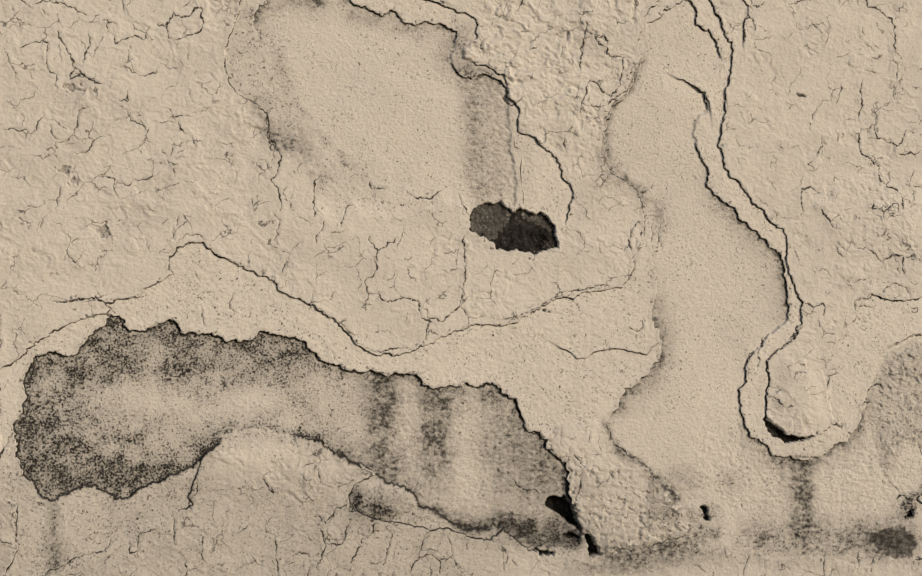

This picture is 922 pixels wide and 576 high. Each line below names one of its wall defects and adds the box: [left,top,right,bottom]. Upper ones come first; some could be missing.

crack [8,0,204,127]
peeling [221,0,578,255]
crack [560,22,624,113]
crack [801,0,922,361]
crack [342,182,468,353]
peeling [8,309,582,548]
crack [239,463,394,576]
damp [336,371,462,510]
damp [432,390,585,550]
spalling [584,533,599,556]
spalling [762,419,805,444]
damp [744,398,918,560]